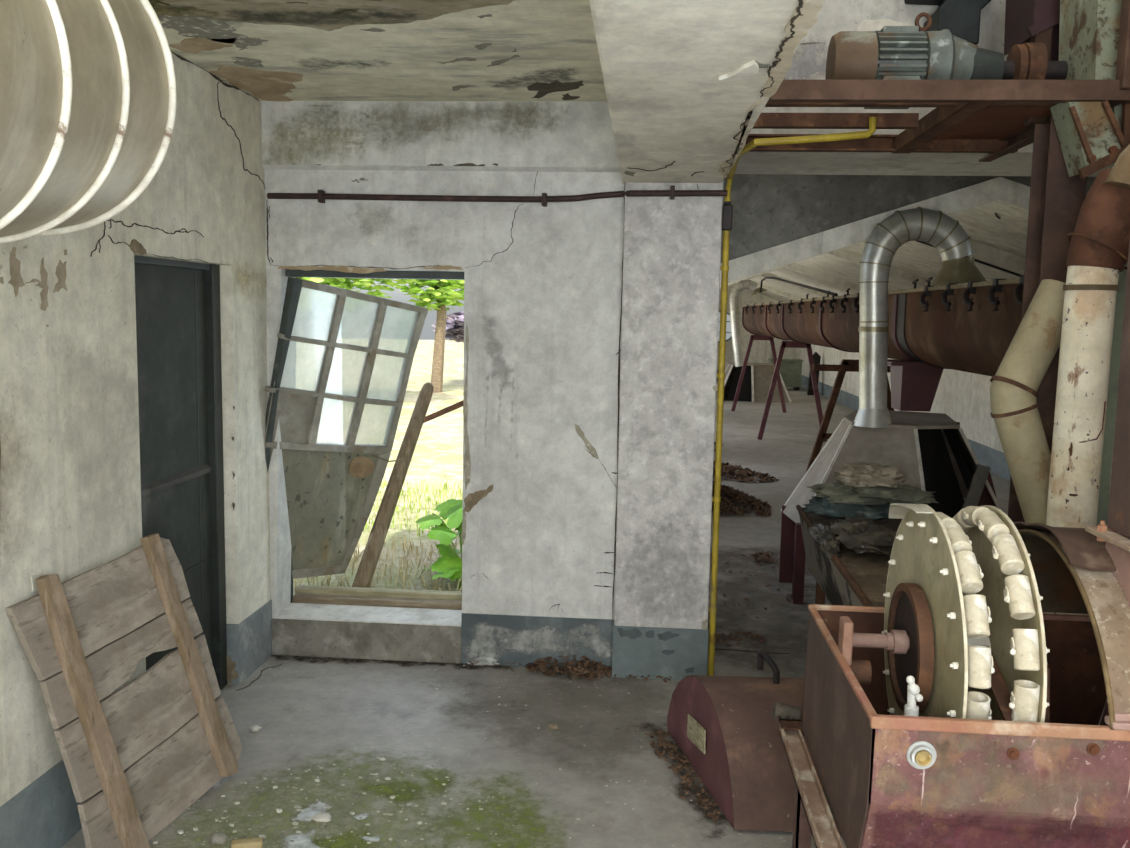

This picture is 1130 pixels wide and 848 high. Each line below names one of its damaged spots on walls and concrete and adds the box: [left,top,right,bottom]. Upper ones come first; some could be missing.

spalling [149,0,520,101]
leakage [495,69,571,87]
peeling [527,80,584,100]
crack [624,0,815,203]
crack [171,51,538,269]
leakage [277,103,536,160]
crack [90,219,222,265]
peeling [0,247,67,311]
peeling [467,623,679,659]
efflorescence [286,801,328,848]